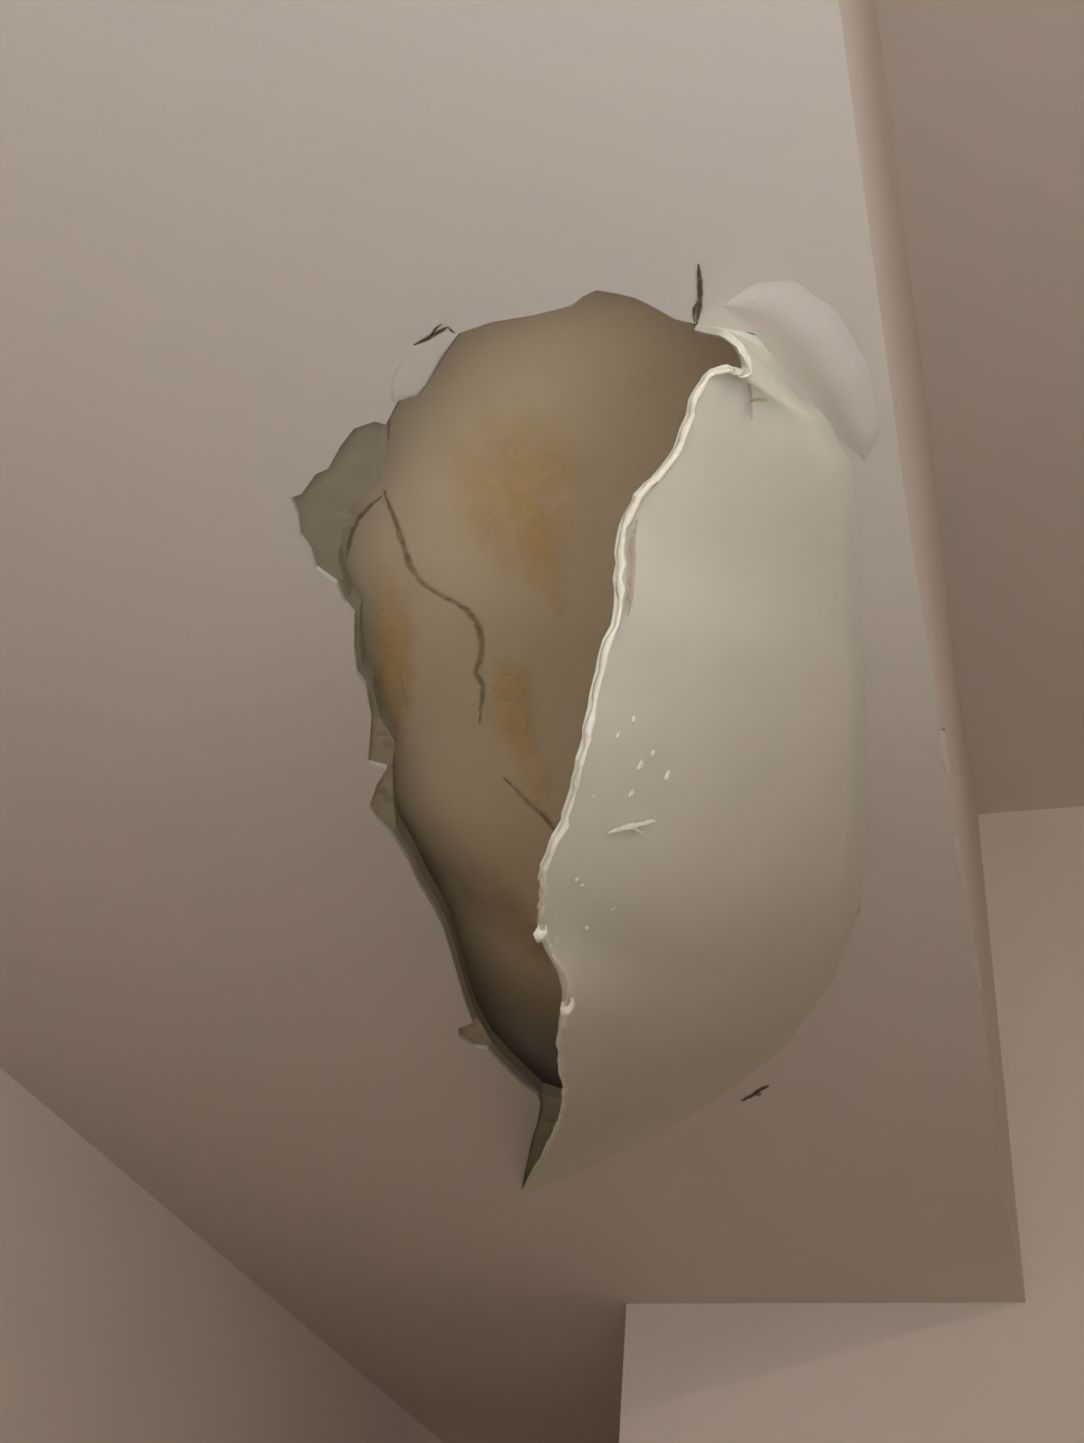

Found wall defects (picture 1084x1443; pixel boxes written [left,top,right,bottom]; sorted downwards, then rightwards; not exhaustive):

crack [347,490,484,724]
peeling [293,331,562,1187]
peeling [560,997,575,1018]